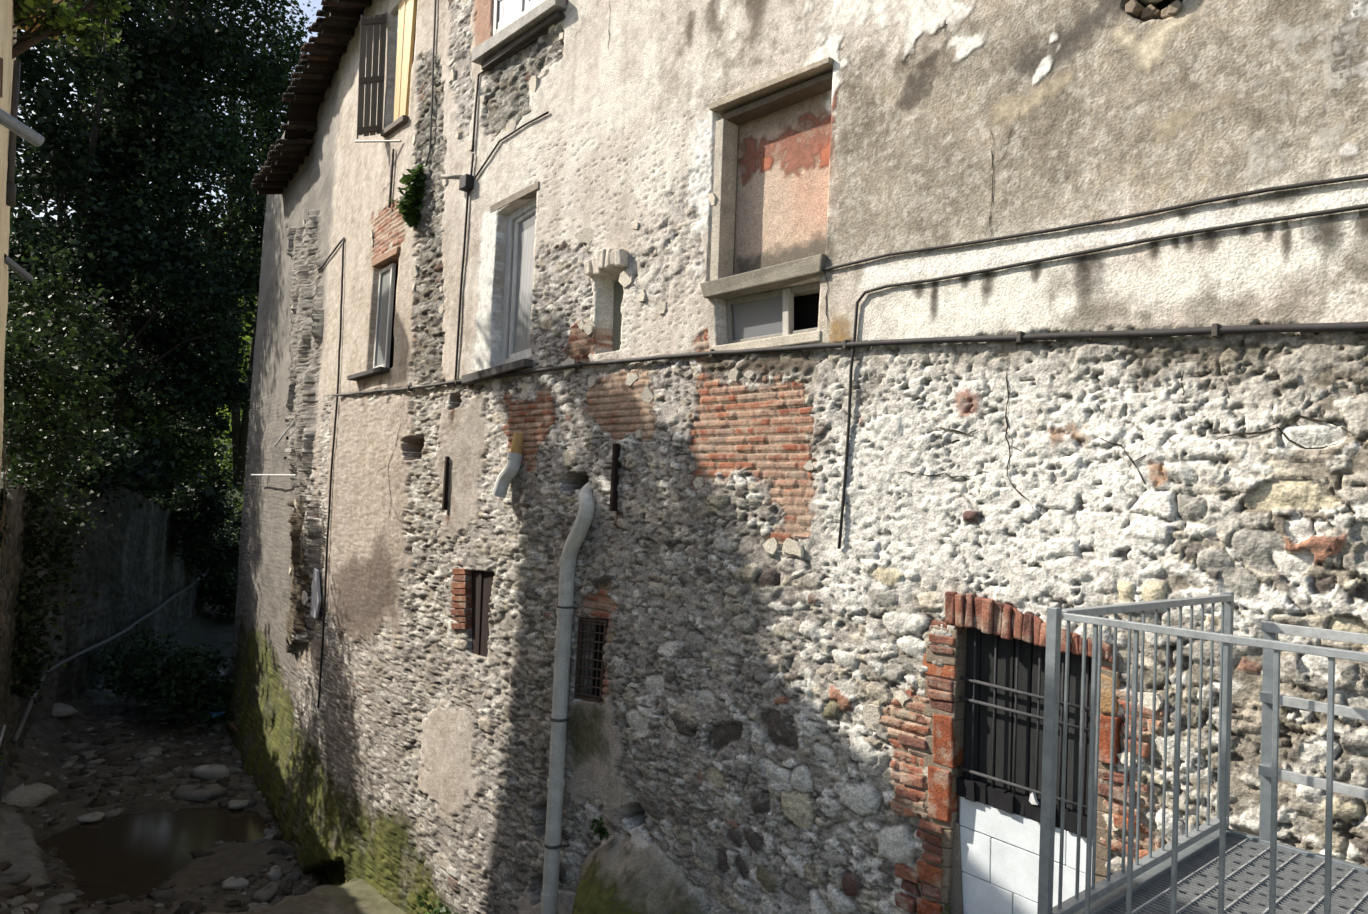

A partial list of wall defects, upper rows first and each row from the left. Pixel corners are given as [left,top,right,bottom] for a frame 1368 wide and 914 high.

spalling [423,0,521,155]
spalling [528,58,559,97]
peeling [738,0,984,186]
water stain [994,0,1199,122]
crack [989,114,1020,235]
spalling [502,227,654,473]
water stain [915,281,937,313]
water stain [961,271,994,293]
water stain [1150,231,1217,257]
water stain [1241,220,1291,254]
spalling [689,329,823,557]
crack [1207,415,1347,449]